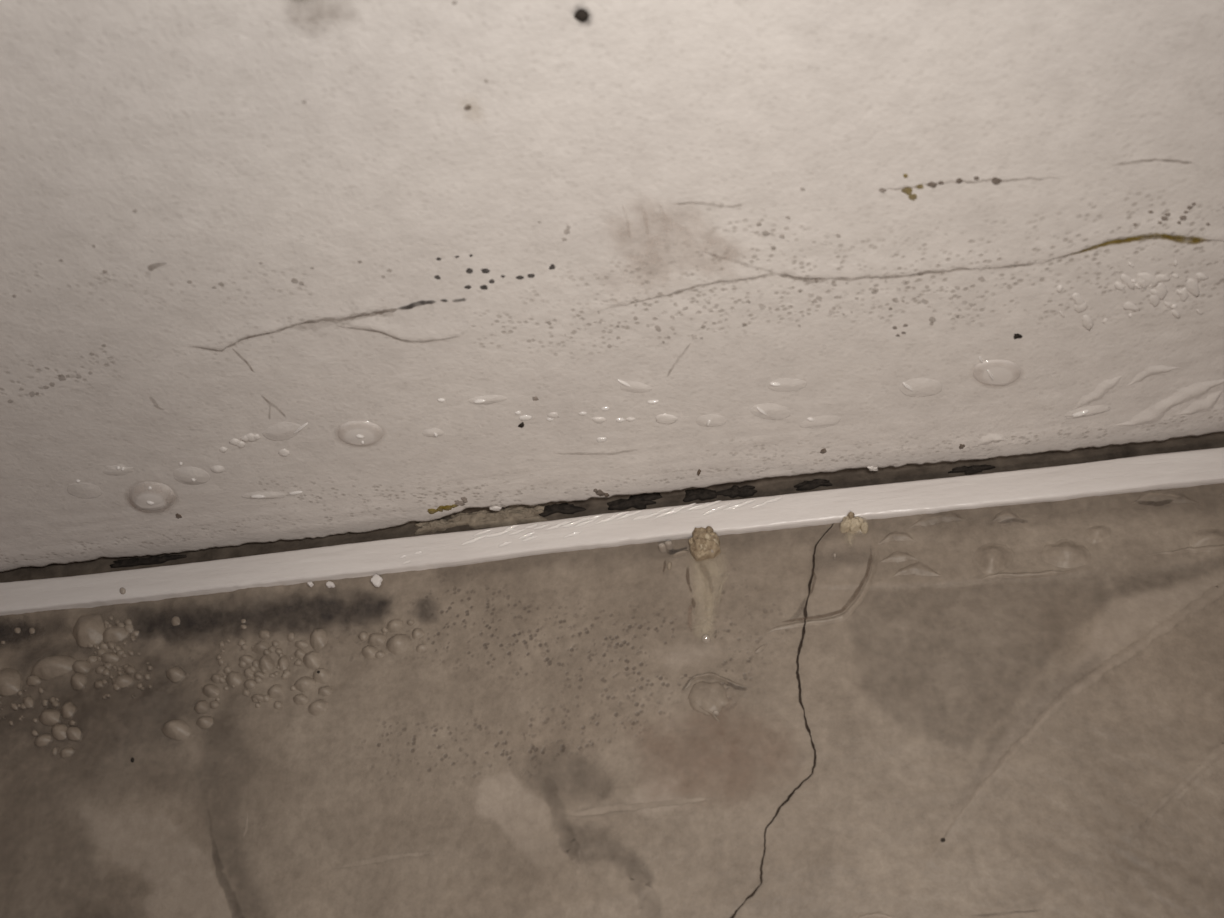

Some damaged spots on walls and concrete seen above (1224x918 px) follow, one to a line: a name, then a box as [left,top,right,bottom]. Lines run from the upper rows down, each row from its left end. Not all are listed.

leakage [1148,202,1196,224]
crack [1076,234,1203,254]
crack [374,299,465,314]
leakage [460,497,782,602]
leakage [146,596,388,637]
leakage [0,623,30,643]
crack [730,523,834,918]